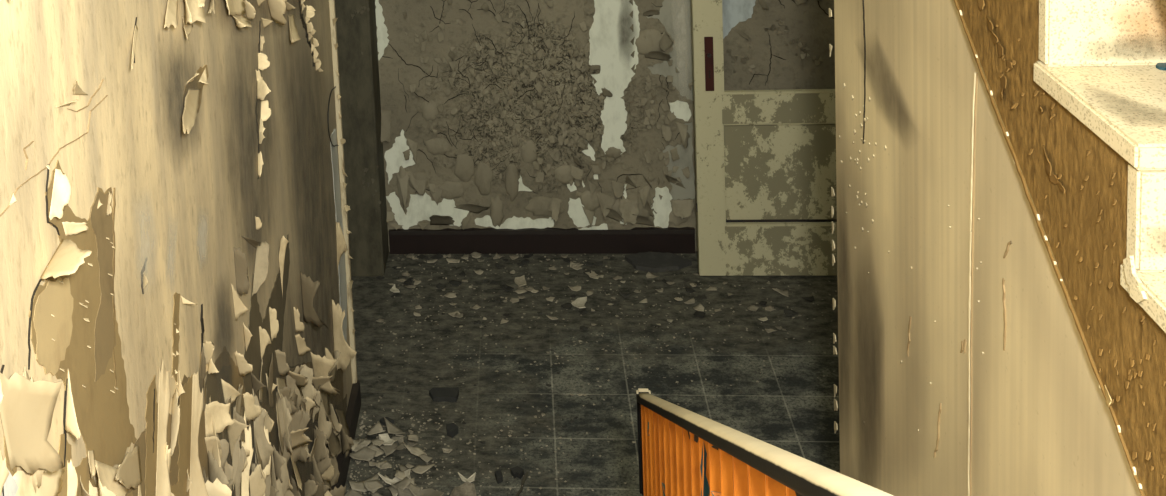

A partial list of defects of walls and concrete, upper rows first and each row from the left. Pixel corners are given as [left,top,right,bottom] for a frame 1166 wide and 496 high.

peeling [164,0,339,179]
flaking render [375,0,389,60]
crack [382,0,585,193]
flaking render [381,0,694,230]
crack [580,166,642,199]
peeling [0,94,357,496]